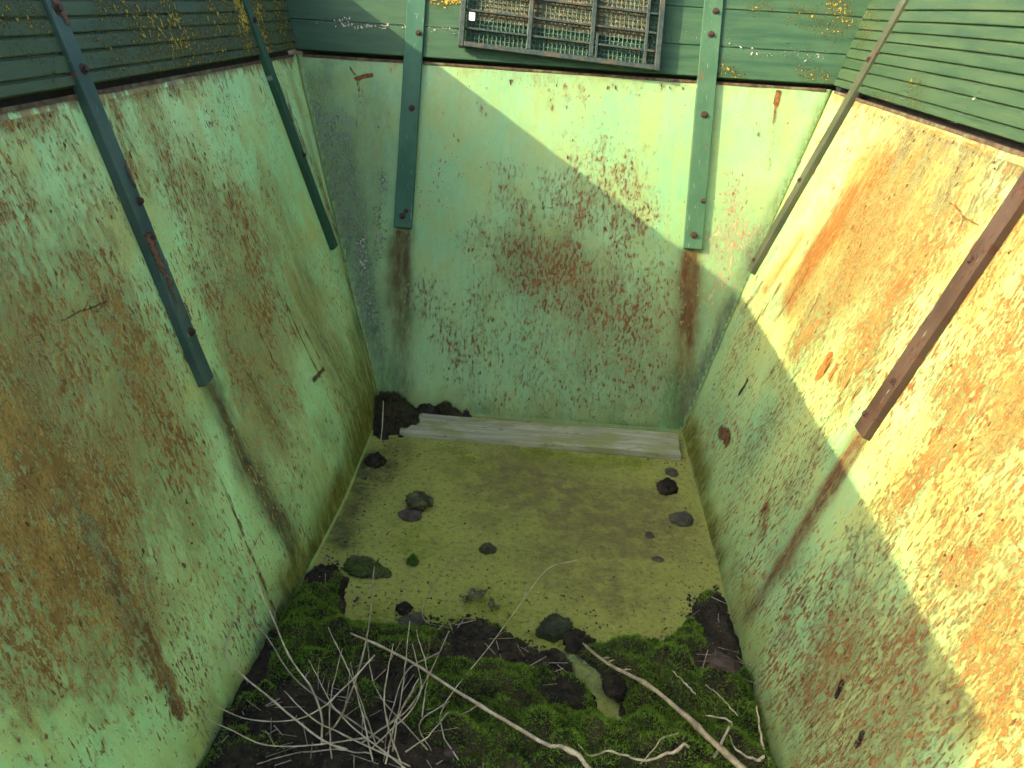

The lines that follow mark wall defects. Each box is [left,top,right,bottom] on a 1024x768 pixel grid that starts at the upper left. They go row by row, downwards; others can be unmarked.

rust [773,90,781,123]
damp [392,228,409,339]
rust [774,146,926,321]
rust [815,352,838,381]
rust [62,476,188,728]
rust [221,480,279,620]